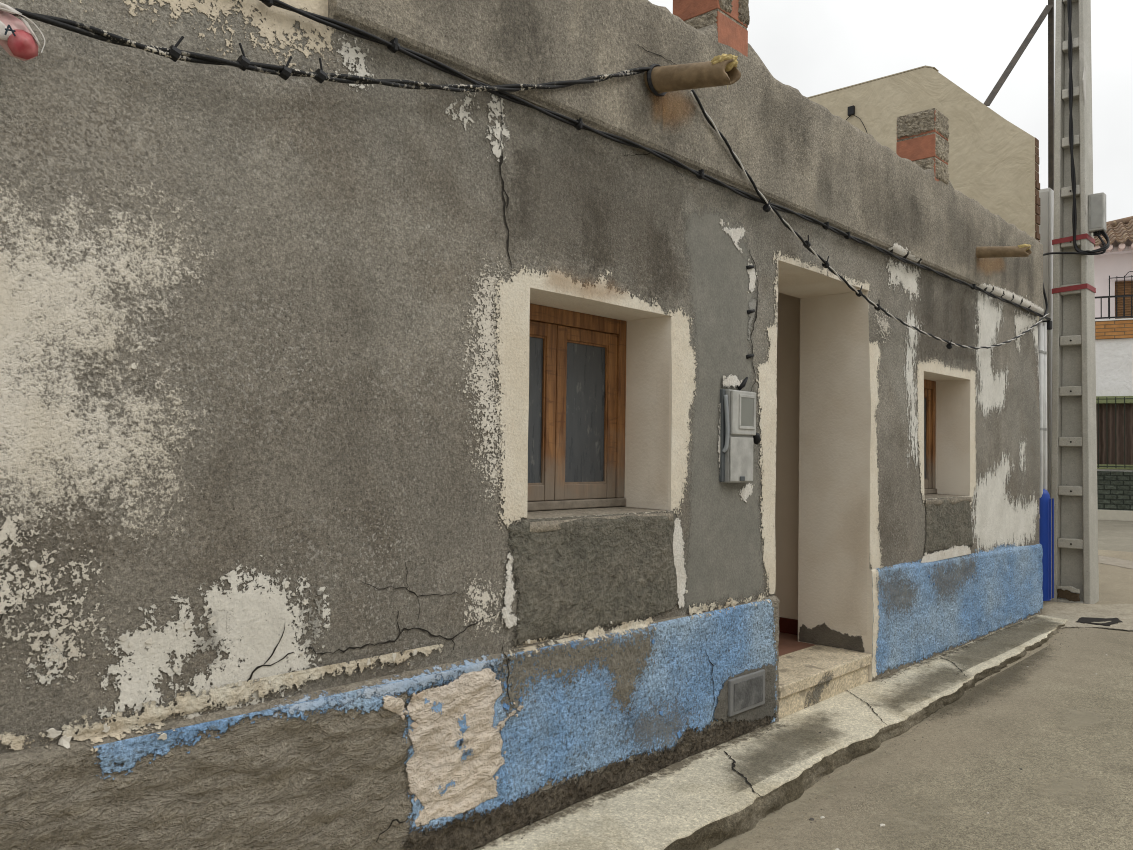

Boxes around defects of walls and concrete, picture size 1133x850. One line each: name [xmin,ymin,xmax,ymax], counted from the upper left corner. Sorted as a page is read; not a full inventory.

crack [499,97,512,268]
peeling [974,283,1044,423]
peeling [0,169,777,850]
peeling [876,436,1040,620]
crack [247,562,511,705]
crack [724,751,762,797]